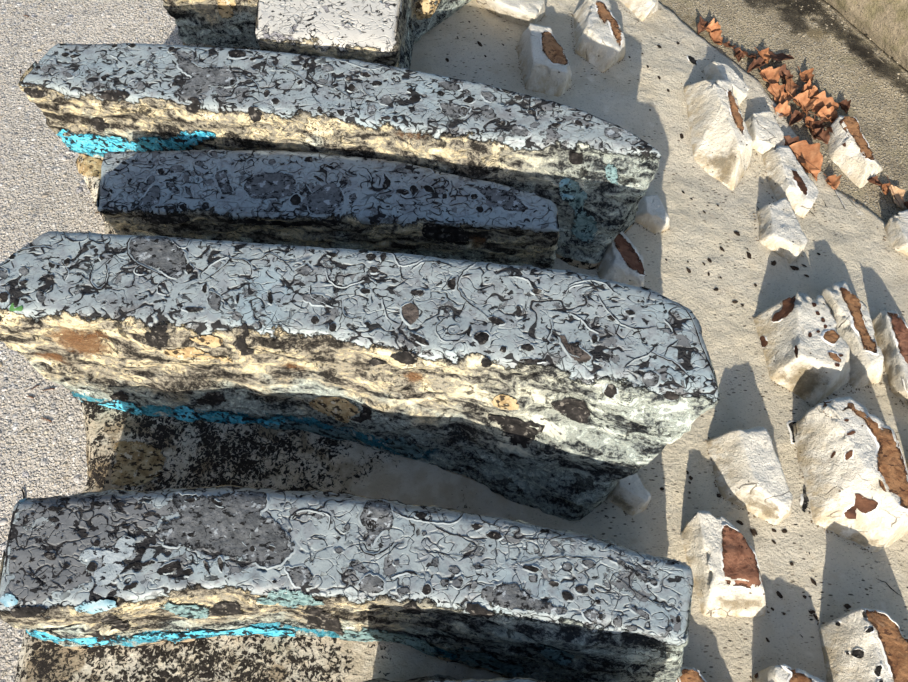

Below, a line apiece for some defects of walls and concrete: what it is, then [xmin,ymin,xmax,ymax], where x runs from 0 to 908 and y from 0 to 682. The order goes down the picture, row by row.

peeling [726,89,745,136]
crack [0,231,173,296]
crack [200,249,295,280]
crack [290,271,399,324]
crack [388,252,717,384]
peeling [823,397,908,513]
peeling [843,494,880,519]
crack [5,505,63,589]
peeling [332,547,652,632]
crack [359,506,658,605]
peeling [720,520,763,589]
peeling [862,608,908,682]